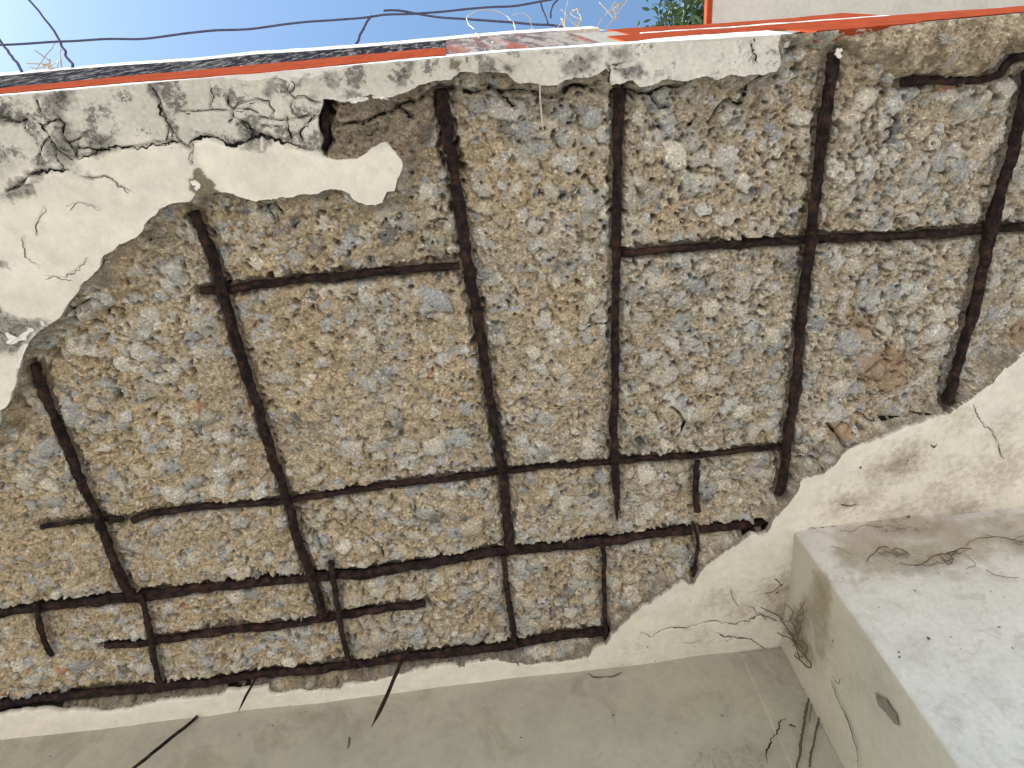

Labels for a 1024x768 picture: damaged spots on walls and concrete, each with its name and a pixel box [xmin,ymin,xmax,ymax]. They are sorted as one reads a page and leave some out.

spalling [889,21,942,29]
water stain [6,93,109,198]
crack [1,63,687,193]
crack [21,203,101,281]
spalling [773,51,1024,496]
spalling [0,30,844,710]
spalling [334,88,982,674]
crack [644,607,767,649]
crack [765,679,859,768]
peeling [875,692,900,726]